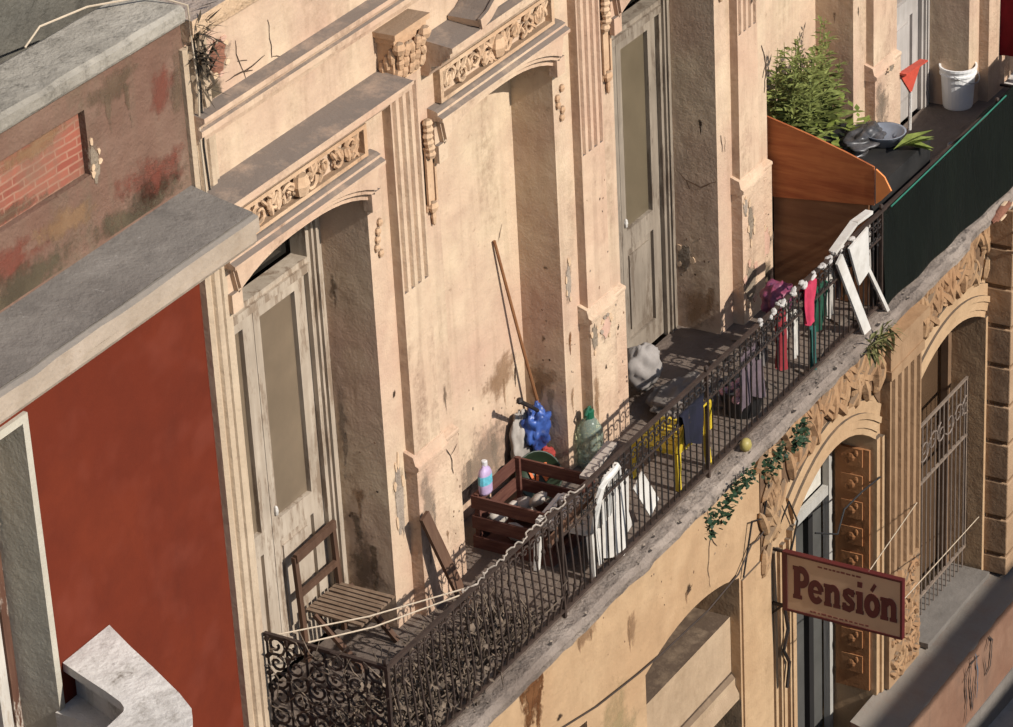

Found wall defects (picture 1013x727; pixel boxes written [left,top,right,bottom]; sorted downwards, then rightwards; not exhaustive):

crack [226,21,280,82]
water stain [97,152,180,239]
water stain [491,355,513,398]
water stain [350,491,380,588]
corrosion [520,673,544,727]